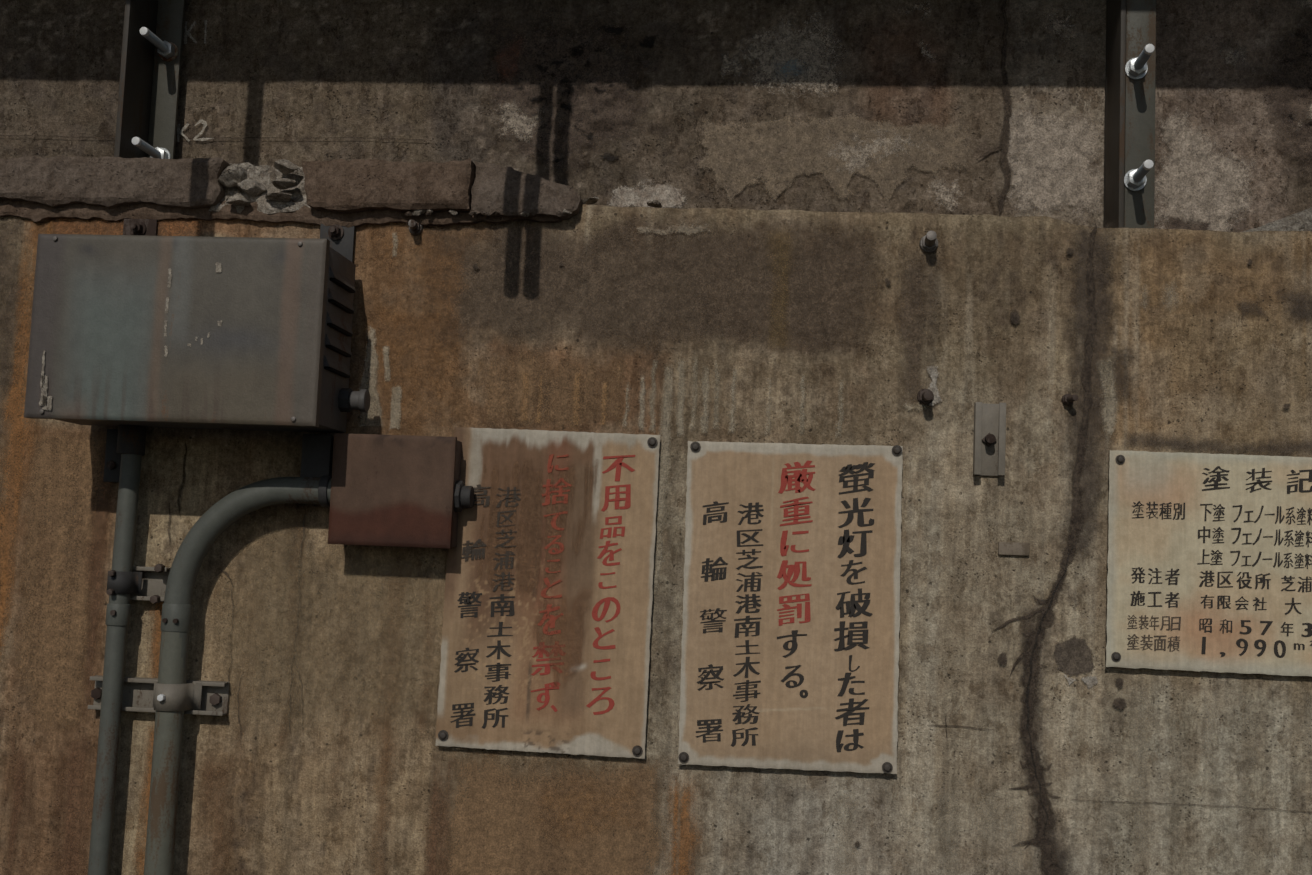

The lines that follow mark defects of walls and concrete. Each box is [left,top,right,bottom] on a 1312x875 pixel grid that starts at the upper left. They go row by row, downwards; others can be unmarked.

corrosion [0,218,124,727]
efflorescence [609,180,686,208]
efflorescence [637,223,710,235]
crack [976,0,1018,214]
leakage [1068,229,1116,551]
crack [927,223,1306,875]